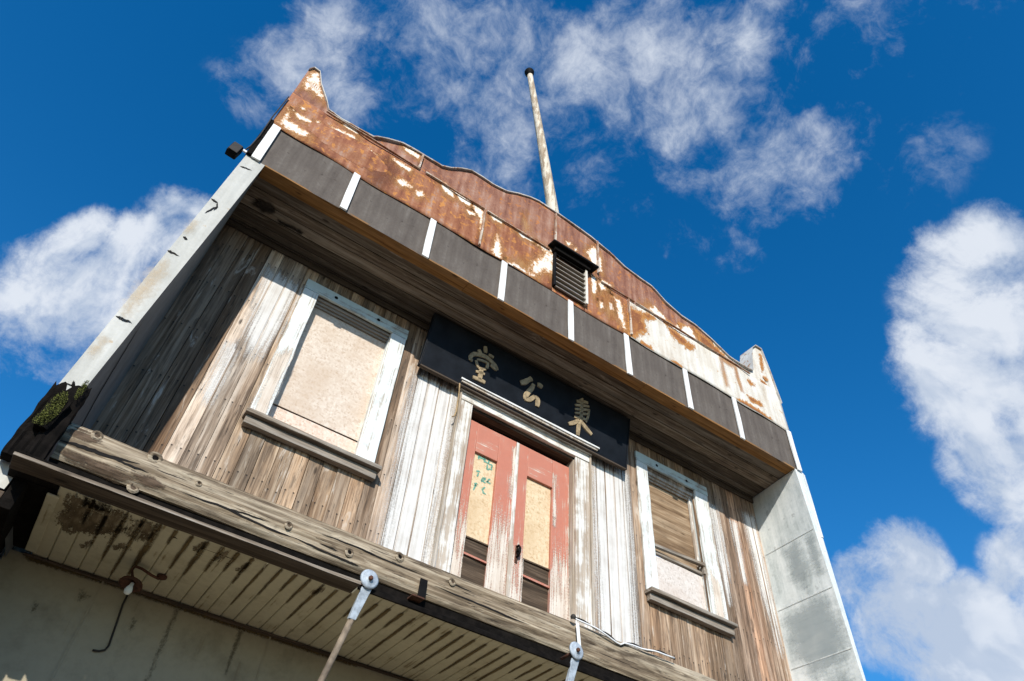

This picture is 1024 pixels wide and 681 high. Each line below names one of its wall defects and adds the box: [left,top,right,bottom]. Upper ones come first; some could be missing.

peeling [274,106,360,142]
peeling [390,146,425,198]
peeling [439,180,559,280]
peeling [566,241,628,334]
crack [61,316,149,473]
rust [600,292,771,420]
leakage [25,496,566,681]
peeling [485,446,524,602]
peeling [549,543,570,620]
peeling [591,460,638,648]
leakage [785,538,820,581]
leakage [786,602,843,672]